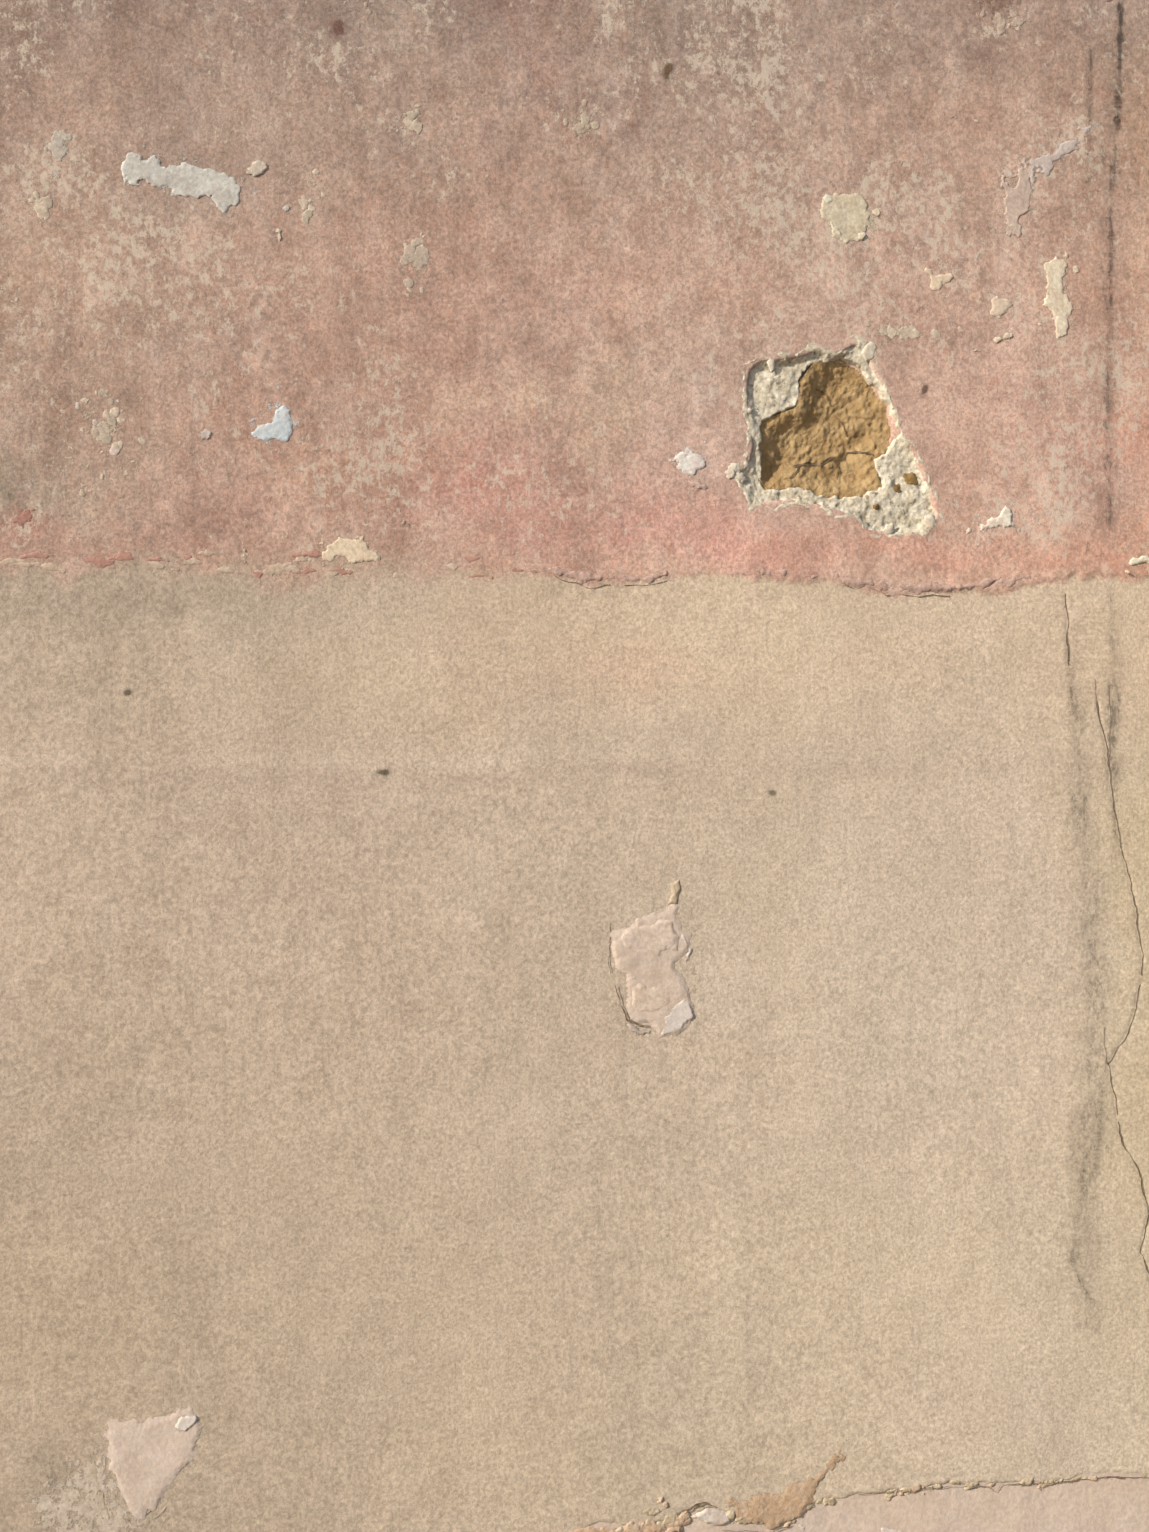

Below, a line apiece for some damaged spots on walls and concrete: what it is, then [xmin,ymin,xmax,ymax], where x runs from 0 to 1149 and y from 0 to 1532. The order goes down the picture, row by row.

peeling [115,139,328,243]
peeling [805,180,889,250]
peeling [999,107,1103,253]
peeling [246,386,304,453]
spalling [664,244,1085,539]
peeling [85,518,405,586]
peeling [959,497,1020,548]
crack [1063,605,1071,665]
peeling [608,879,696,1048]
crack [1095,685,1149,1273]
peeling [25,1405,205,1532]
peeling [570,1450,1149,1532]